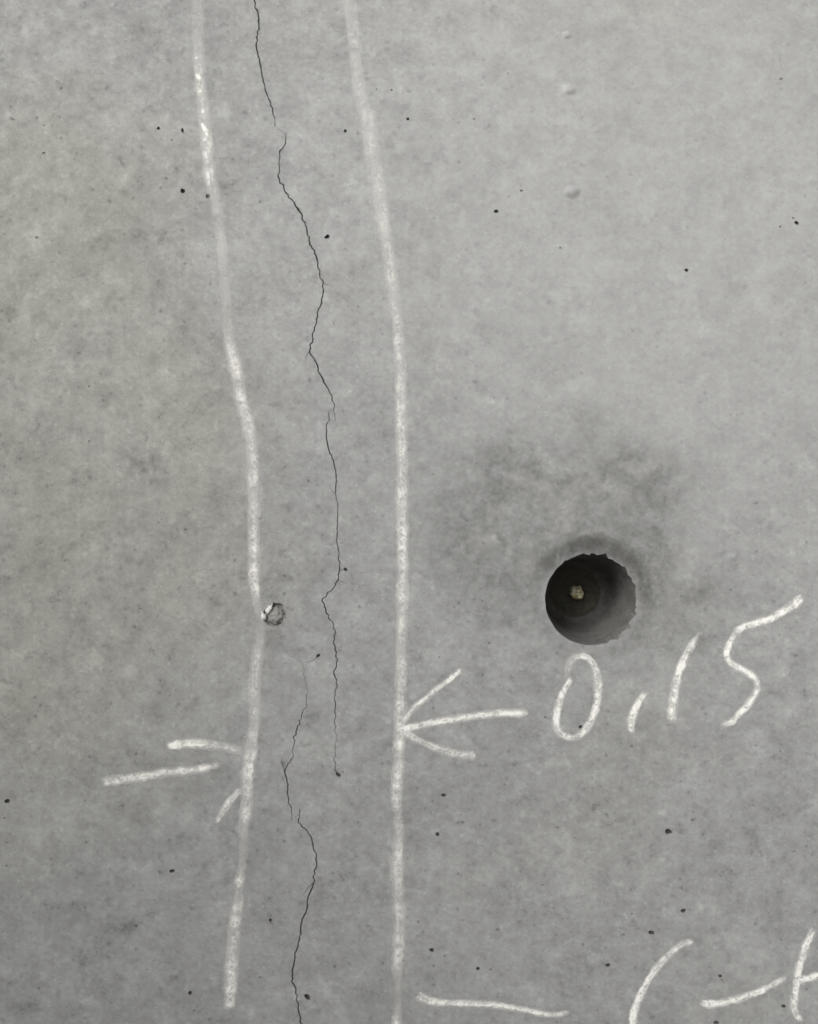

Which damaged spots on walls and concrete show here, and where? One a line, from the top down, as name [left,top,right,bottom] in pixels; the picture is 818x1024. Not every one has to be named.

crack [254,0,348,1024]